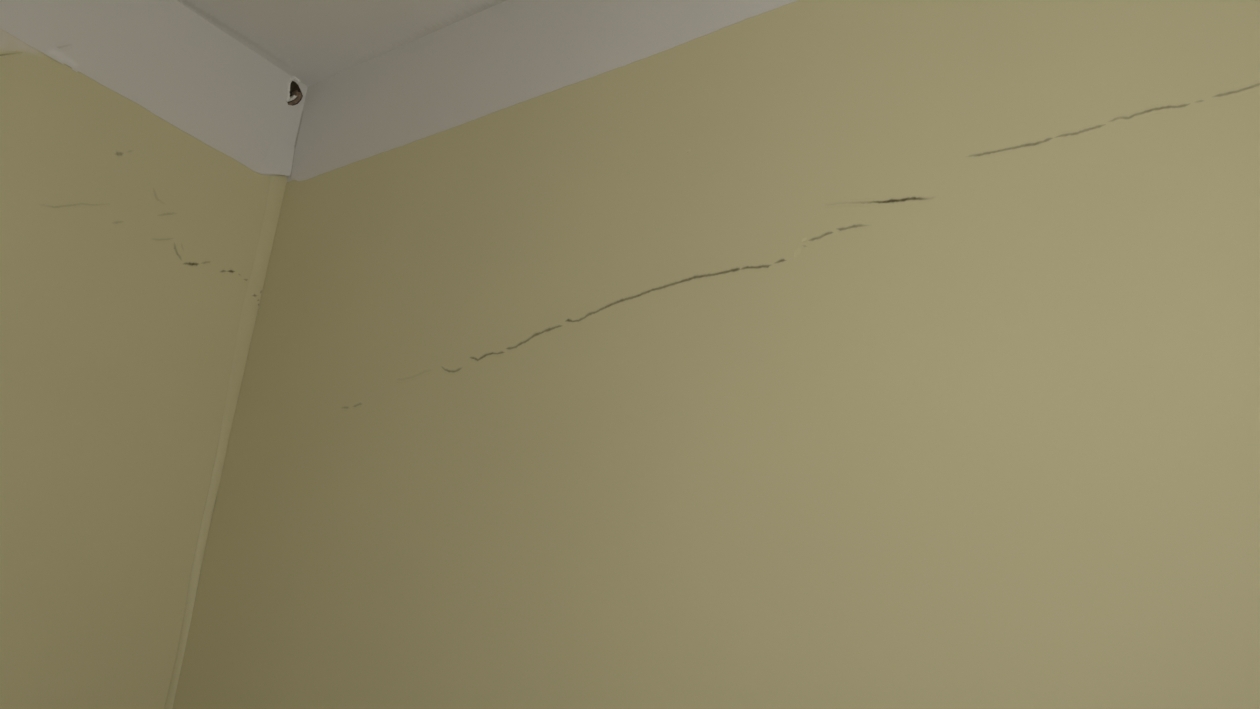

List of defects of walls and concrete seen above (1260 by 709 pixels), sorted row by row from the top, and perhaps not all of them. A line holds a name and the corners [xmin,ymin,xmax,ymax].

crack [965,80,1260,160]
crack [150,236,248,283]
crack [395,193,937,383]